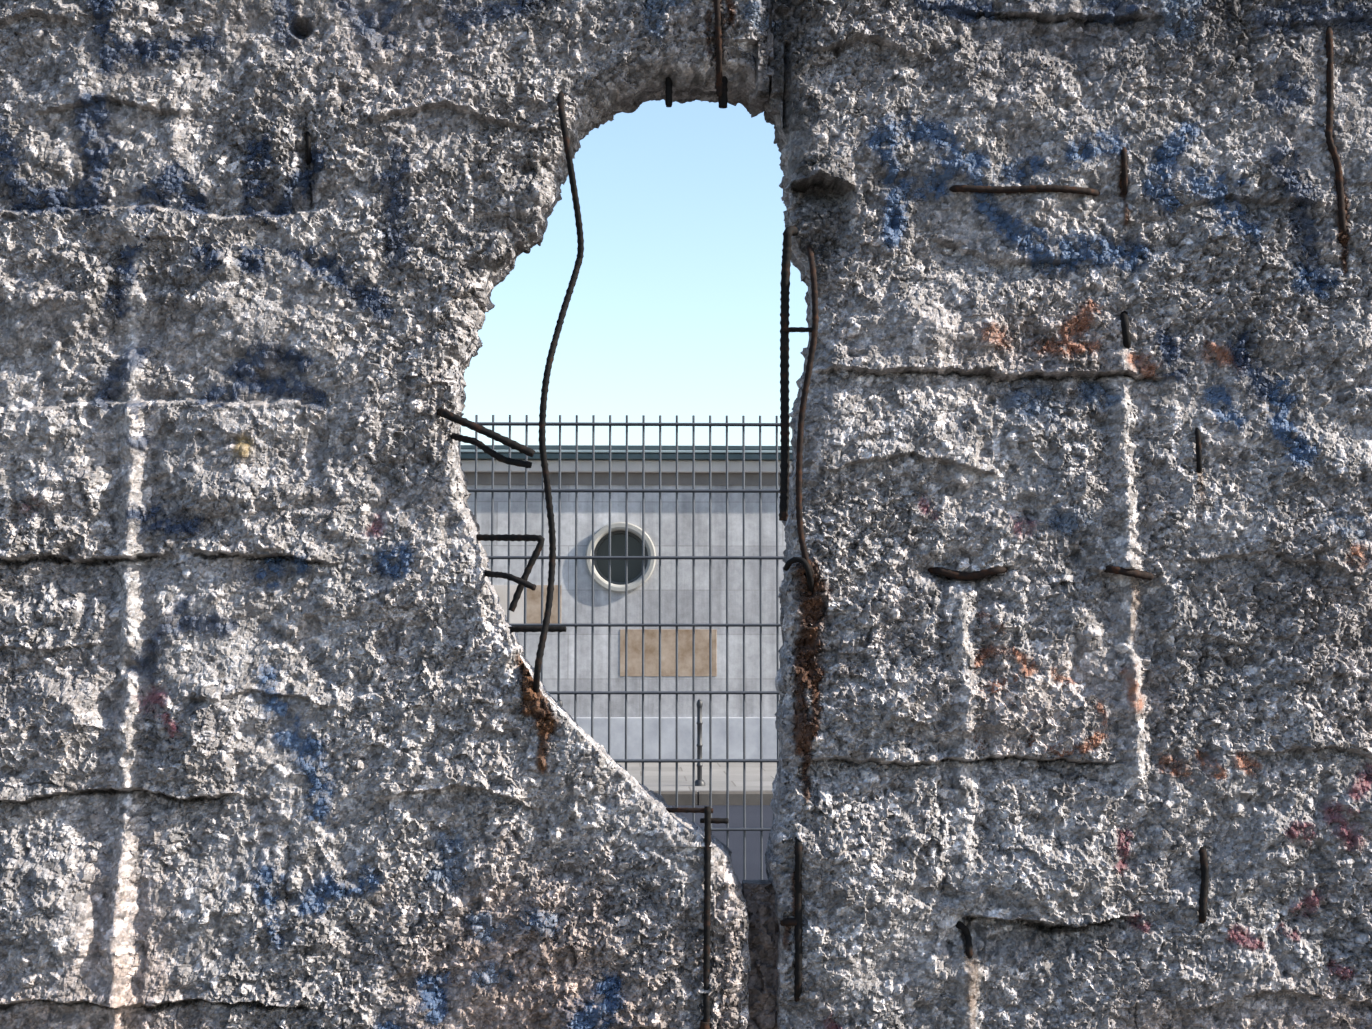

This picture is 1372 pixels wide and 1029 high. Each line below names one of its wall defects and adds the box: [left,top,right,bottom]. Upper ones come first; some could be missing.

corrosion [706,0,735,61]
spalling [590,38,776,114]
spalling [441,156,552,354]
corrosion [1334,178,1350,273]
crack [0,556,157,597]
crack [193,554,321,565]
corrosion [518,656,557,772]
corrosion [793,559,827,801]
crack [0,782,228,805]
spalling [517,693,715,865]
crack [962,917,1124,953]
crack [0,999,304,1029]